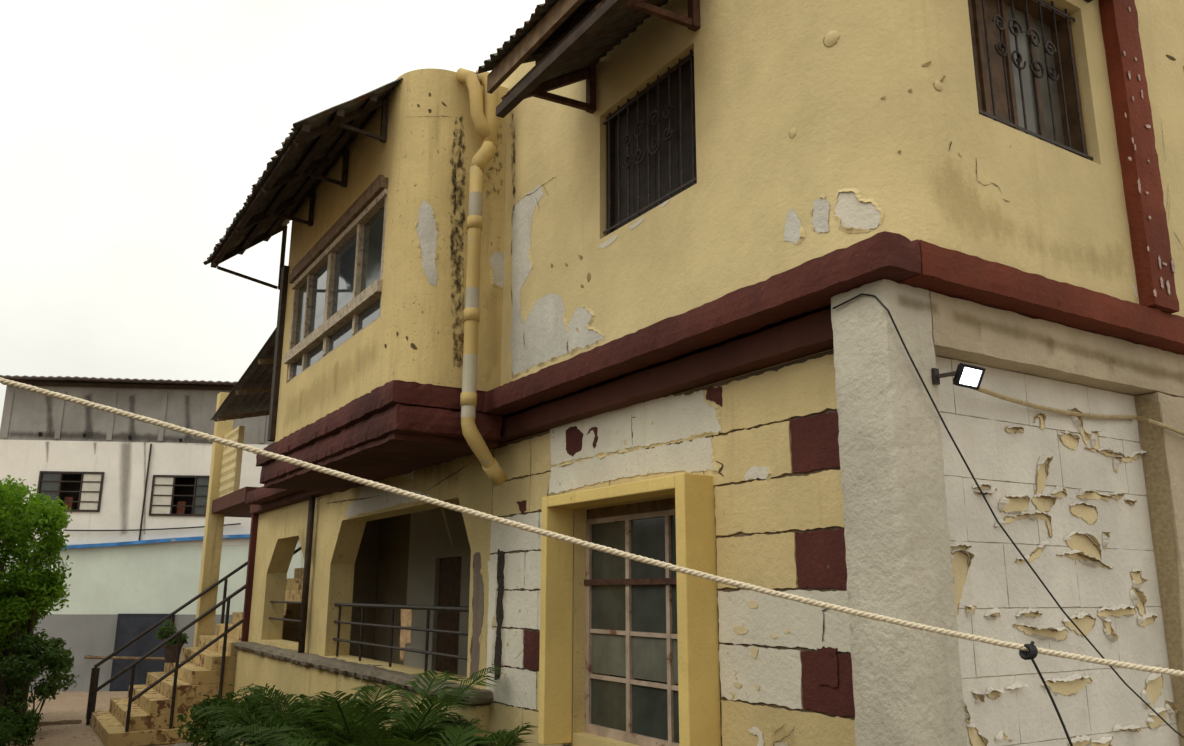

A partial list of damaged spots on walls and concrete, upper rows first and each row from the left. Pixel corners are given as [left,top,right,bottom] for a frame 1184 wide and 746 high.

peeling [414,200,439,286]
damp [450,117,465,361]
peeling [489,185,604,378]
peeling [783,187,884,246]
peeling [1147,246,1175,297]
damp [11,396,213,530]
peeling [1058,407,1147,473]
peeling [972,454,1138,569]
peeling [950,542,1001,620]
peeling [1013,568,1157,642]
peeling [964,673,1093,746]
peeling [1067,673,1180,746]